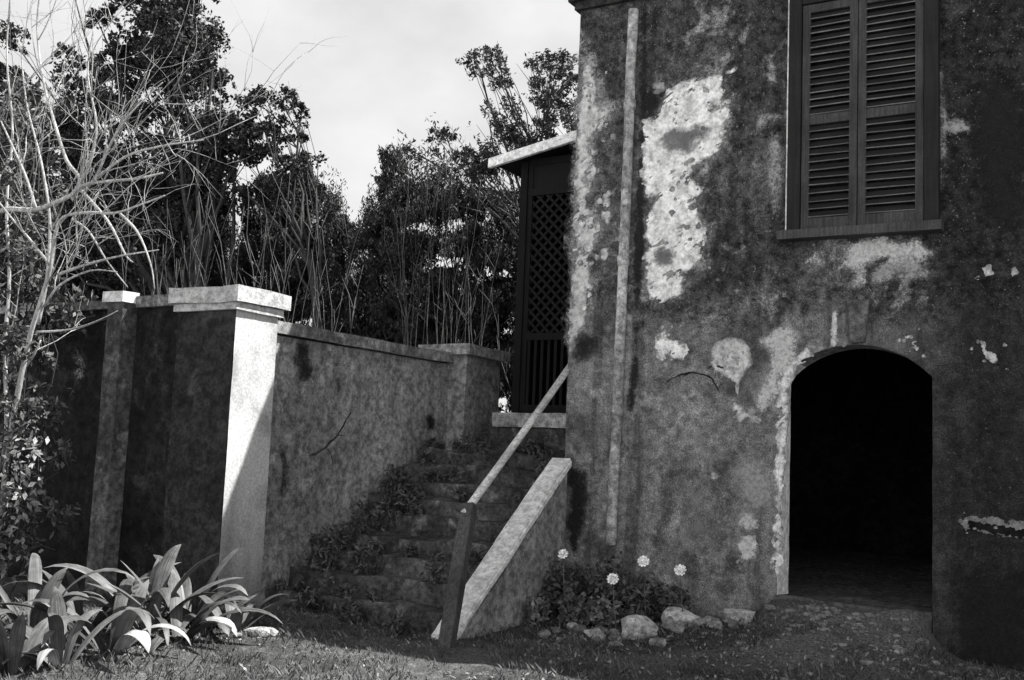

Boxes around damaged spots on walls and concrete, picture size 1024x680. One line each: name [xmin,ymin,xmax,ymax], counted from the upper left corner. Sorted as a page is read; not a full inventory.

water stain [627,8,659,411]
peeling [639,65,737,303]
flaking render [975,264,994,280]
water stain [573,333,596,362]
peeling [654,325,689,361]
crack [667,365,723,393]
water stain [757,327,796,412]
flaking render [970,339,1007,370]
crack [309,412,352,466]
peeling [709,337,814,576]
water stain [566,468,587,551]
water stain [736,457,775,530]